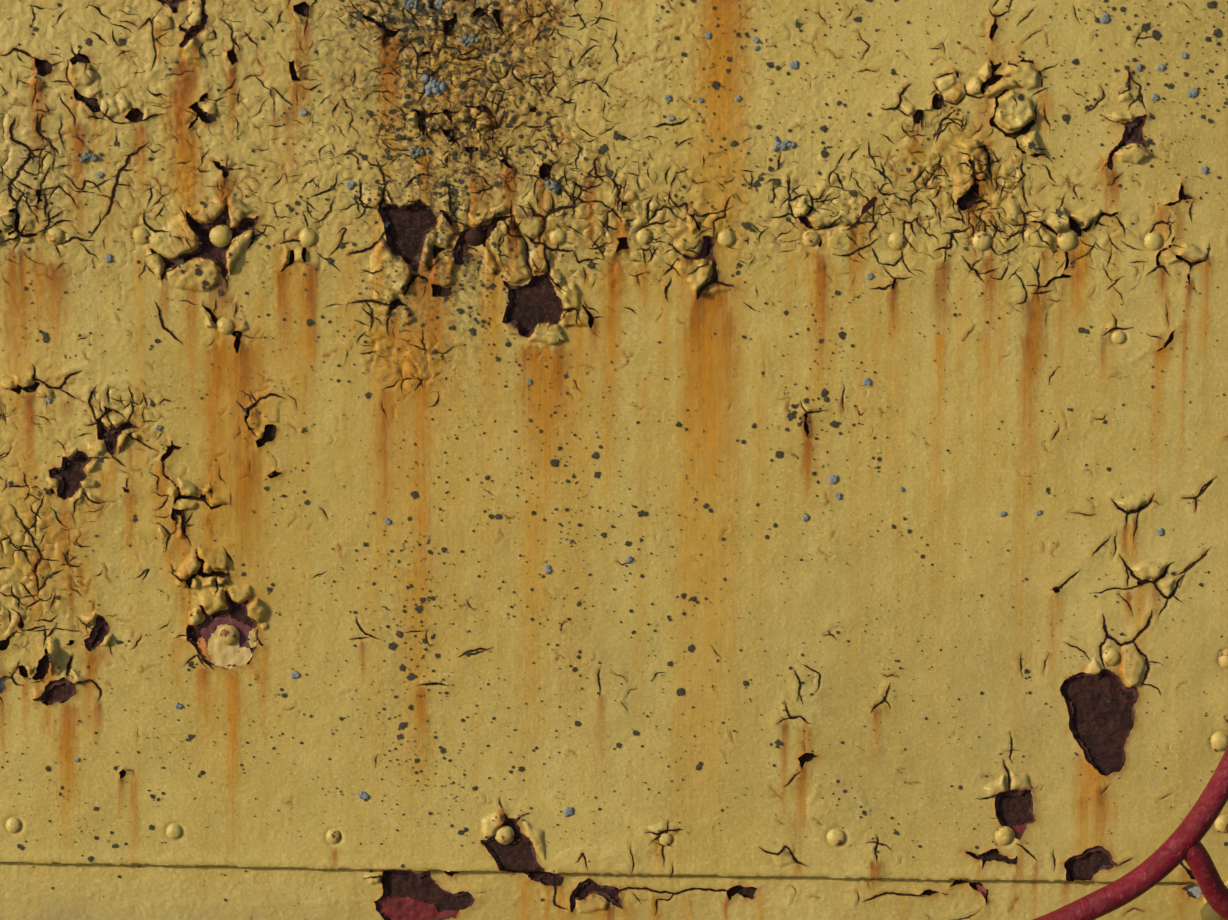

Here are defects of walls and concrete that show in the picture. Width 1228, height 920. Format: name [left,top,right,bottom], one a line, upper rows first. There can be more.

crack [0,0,880,363]
peeling [1,363,227,535]
crack [783,382,882,458]
crack [0,336,268,704]
peeling [18,603,113,705]
peeling [174,545,270,669]
crack [416,647,493,686]
crack [776,664,821,724]
peeling [1060,610,1161,794]
peeling [363,869,484,920]
peeling [480,797,623,914]
crack [857,834,979,920]